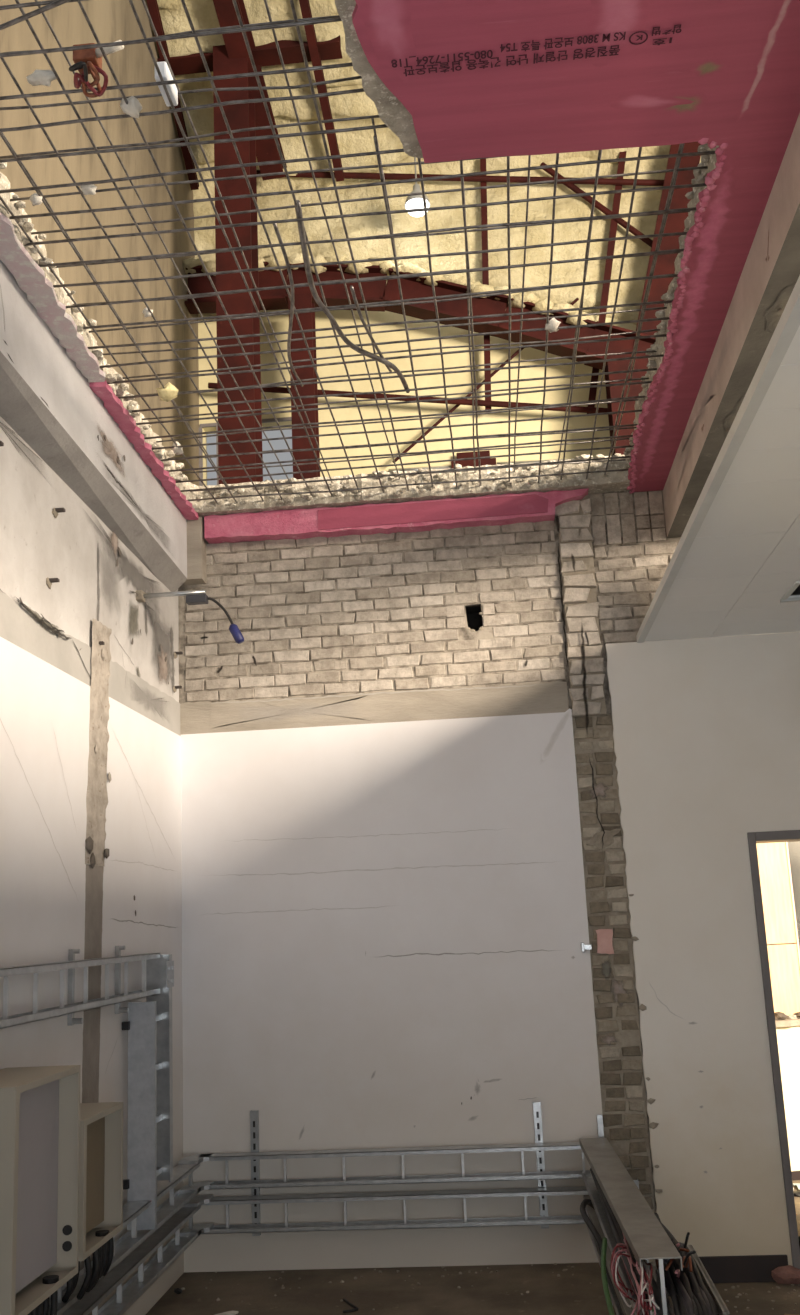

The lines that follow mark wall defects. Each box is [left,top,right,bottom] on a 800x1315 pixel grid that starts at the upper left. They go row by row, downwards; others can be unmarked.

spalling [0,0,716,504]
crack [0,718,401,928]
crack [108,722,605,876]
crack [365,949,562,958]